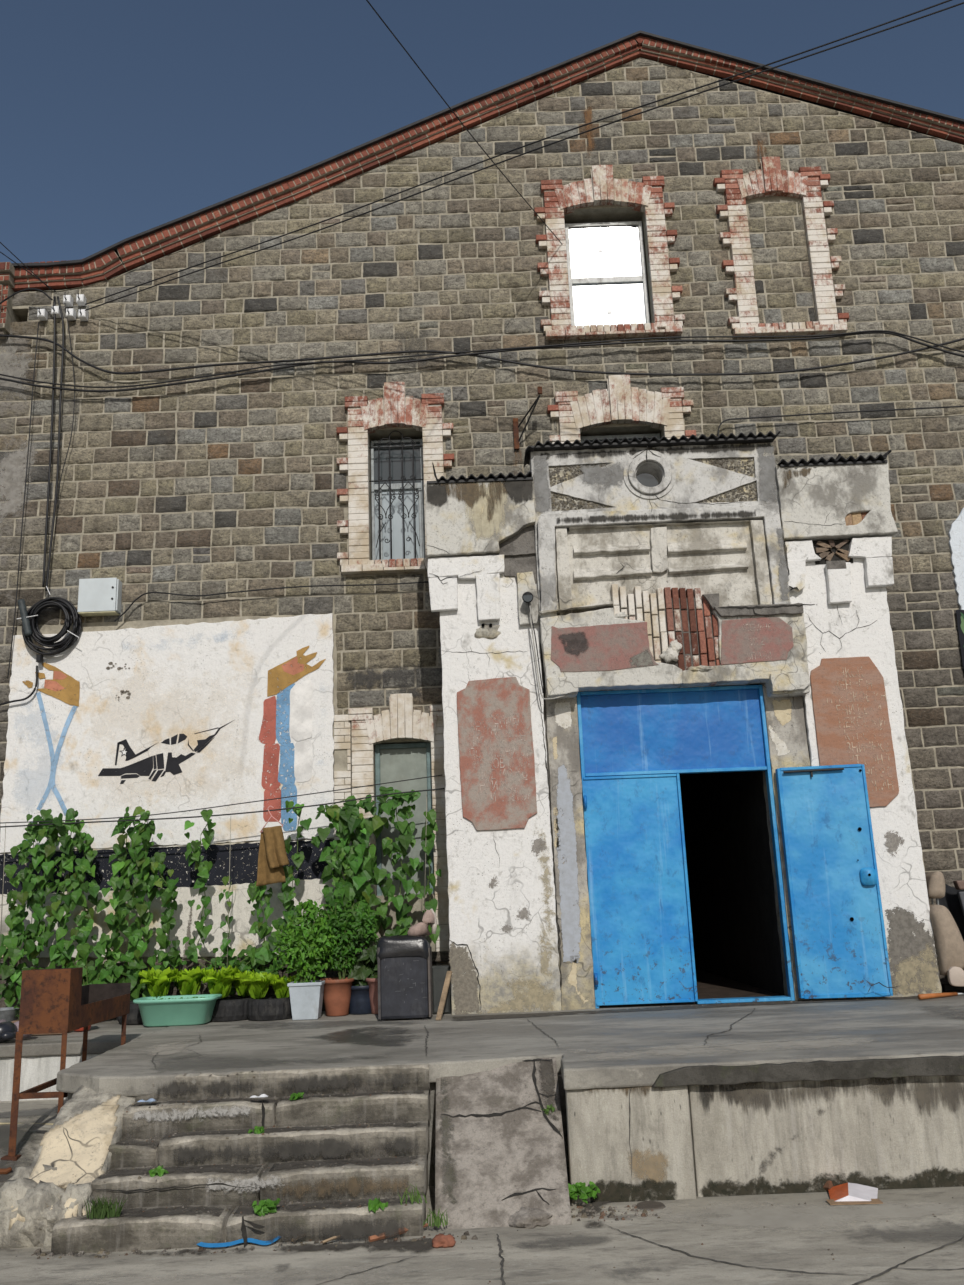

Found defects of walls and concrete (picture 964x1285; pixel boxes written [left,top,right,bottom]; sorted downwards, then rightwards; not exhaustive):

leakage [467,482,506,538]
crack [719,514,877,654]
flaking render [611,584,720,686]
flaking render [449,940,481,1015]
flaking render [885,907,940,995]
crack [442,1008,963,1138]
peeling [0,1094,121,1246]
crack [502,1188,555,1204]
leakage [632,1150,668,1183]
crack [605,1224,964,1285]